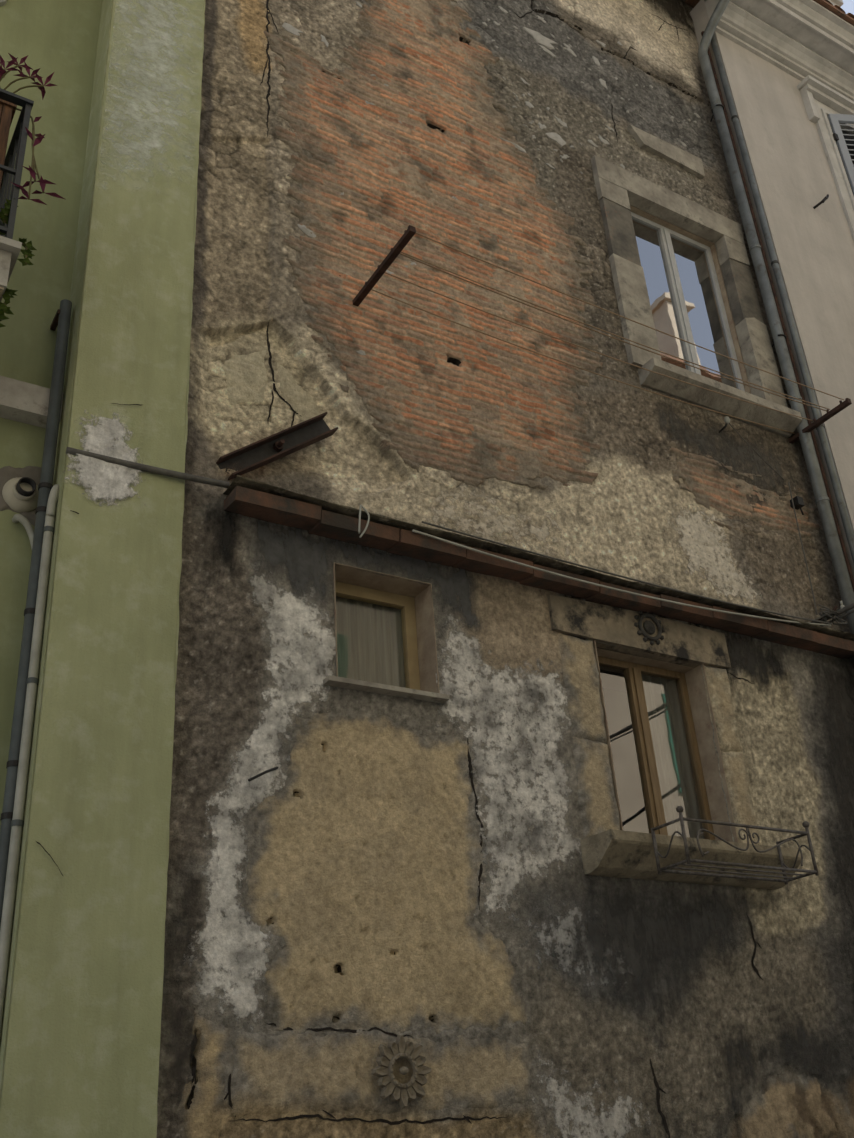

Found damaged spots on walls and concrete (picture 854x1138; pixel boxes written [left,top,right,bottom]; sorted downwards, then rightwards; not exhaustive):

crack [510,0,697,99]
peeling [581,40,627,103]
spalling [263,0,614,556]
crack [266,322,301,427]
spalling [174,563,627,1138]
crack [187,1032,198,1109]
crack [268,1023,412,1037]
crack [224,1074,507,1125]